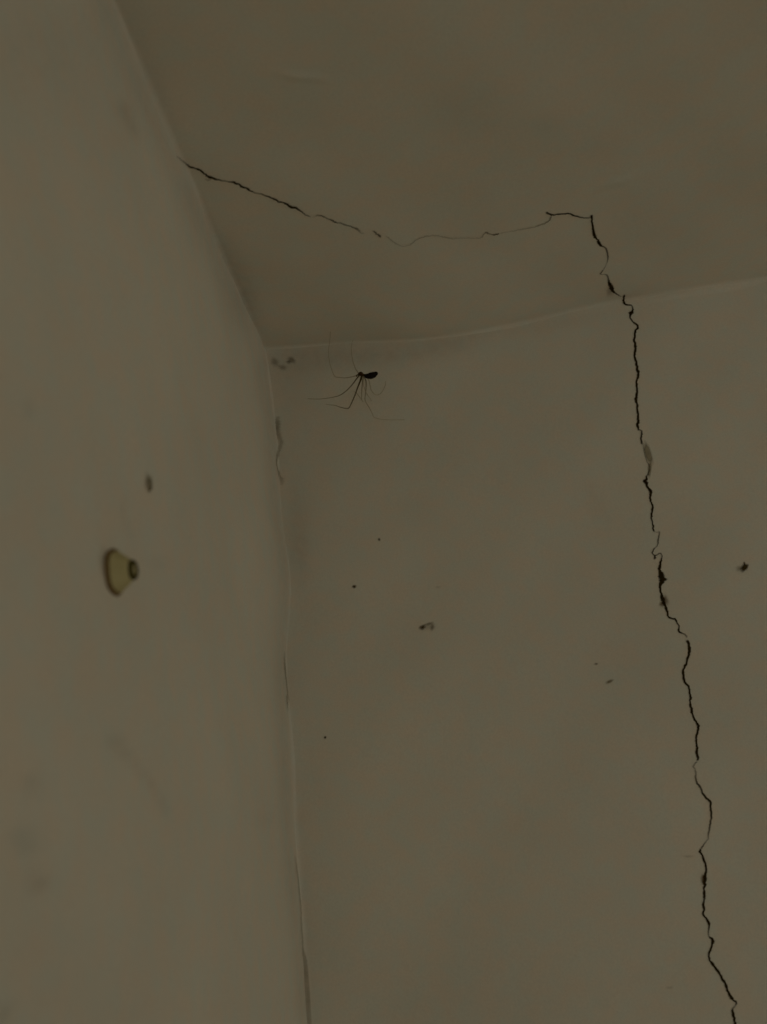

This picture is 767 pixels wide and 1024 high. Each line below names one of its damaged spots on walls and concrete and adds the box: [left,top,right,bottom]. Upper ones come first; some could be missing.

crack [186,164,381,237]
crack [546,212,643,444]
crack [643,471,737,1024]